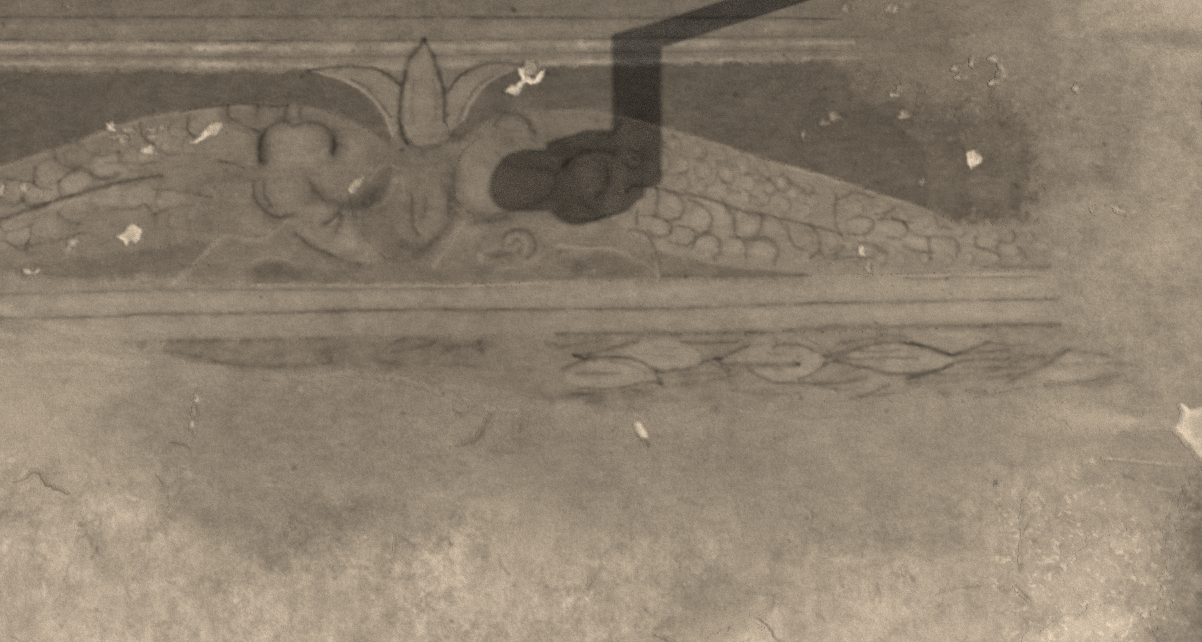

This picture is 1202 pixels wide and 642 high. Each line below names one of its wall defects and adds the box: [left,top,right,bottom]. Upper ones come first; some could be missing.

peeling [503,57,548,98]
peeling [188,120,227,147]
peeling [964,148,986,172]
peeling [115,222,146,247]
crack [739,611,784,642]